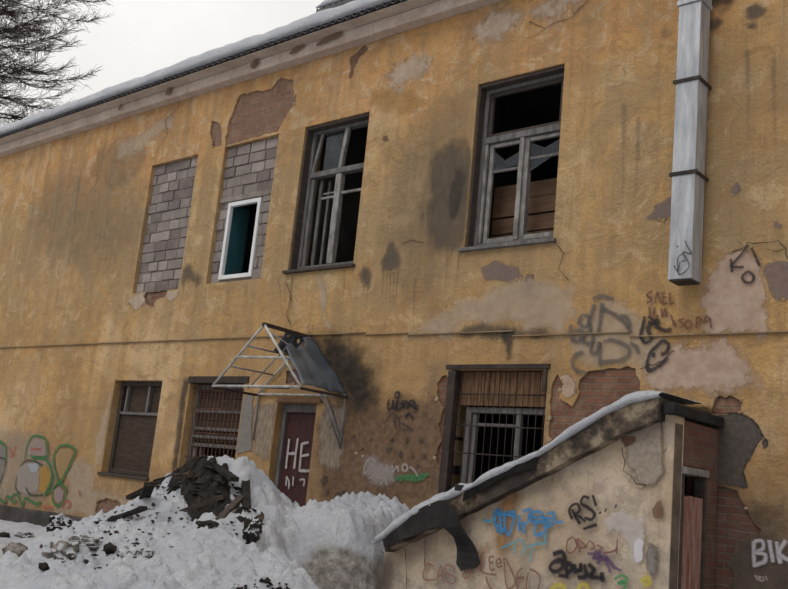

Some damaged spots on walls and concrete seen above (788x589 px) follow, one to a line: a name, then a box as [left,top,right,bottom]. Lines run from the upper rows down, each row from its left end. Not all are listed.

peeling [469,0,580,42]
crack [528,0,588,38]
leakage [747,5,765,28]
peeling [384,54,432,93]
spalling [210,78,296,148]
leakage [428,146,471,249]
leakage [361,268,370,284]
leakage [383,244,399,269]
spalling [128,291,178,311]
peeling [547,250,788,442]